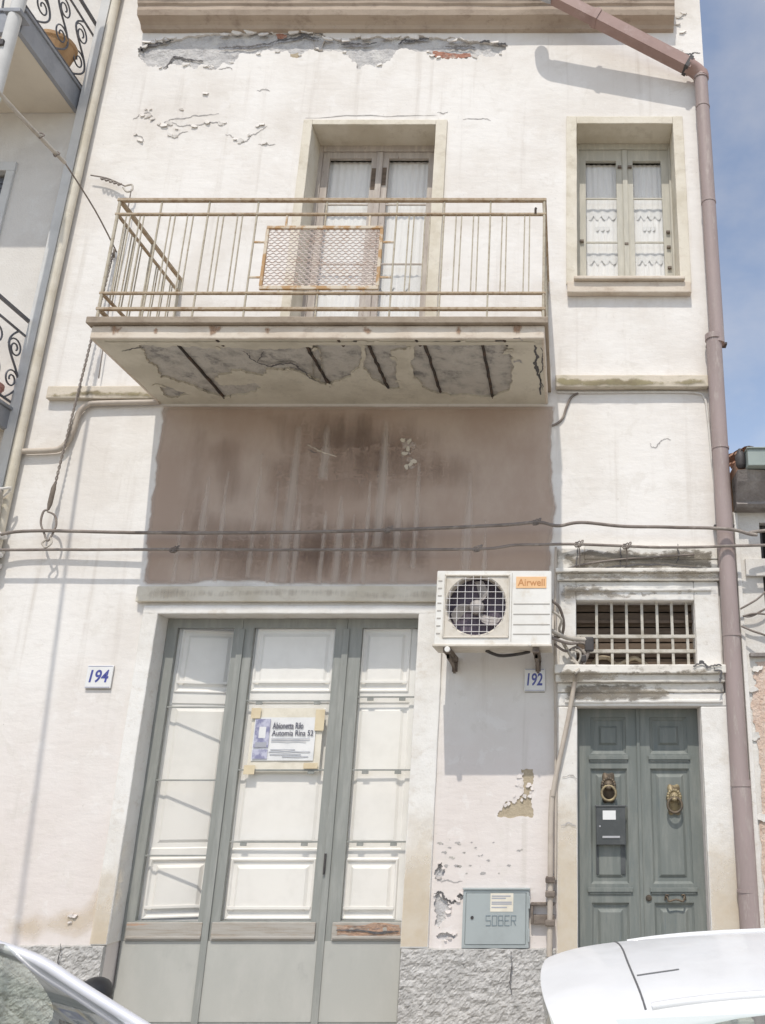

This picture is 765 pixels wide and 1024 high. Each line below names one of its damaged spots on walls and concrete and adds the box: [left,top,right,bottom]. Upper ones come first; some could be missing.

flaking render [138,30,508,70]
peeling [133,108,274,146]
spalling [140,340,514,399]
water stain [145,407,716,598]
peeling [497,769,534,818]
peeling [434,842,511,879]
flaking render [433,891,463,941]